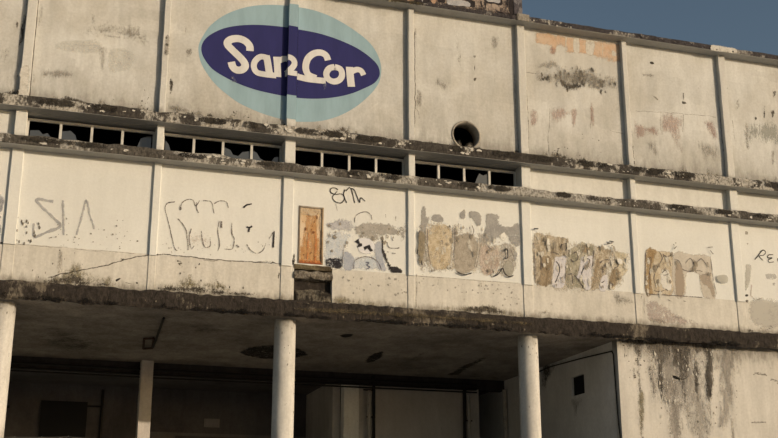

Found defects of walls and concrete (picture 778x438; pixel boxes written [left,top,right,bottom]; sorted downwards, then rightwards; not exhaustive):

water stain [539,62,616,94]
peeling [420,206,520,273]
crack [49,249,281,278]
peeling [538,236,621,288]
peeling [646,252,711,296]
water stain [464,306,503,315]
water stain [619,339,739,438]